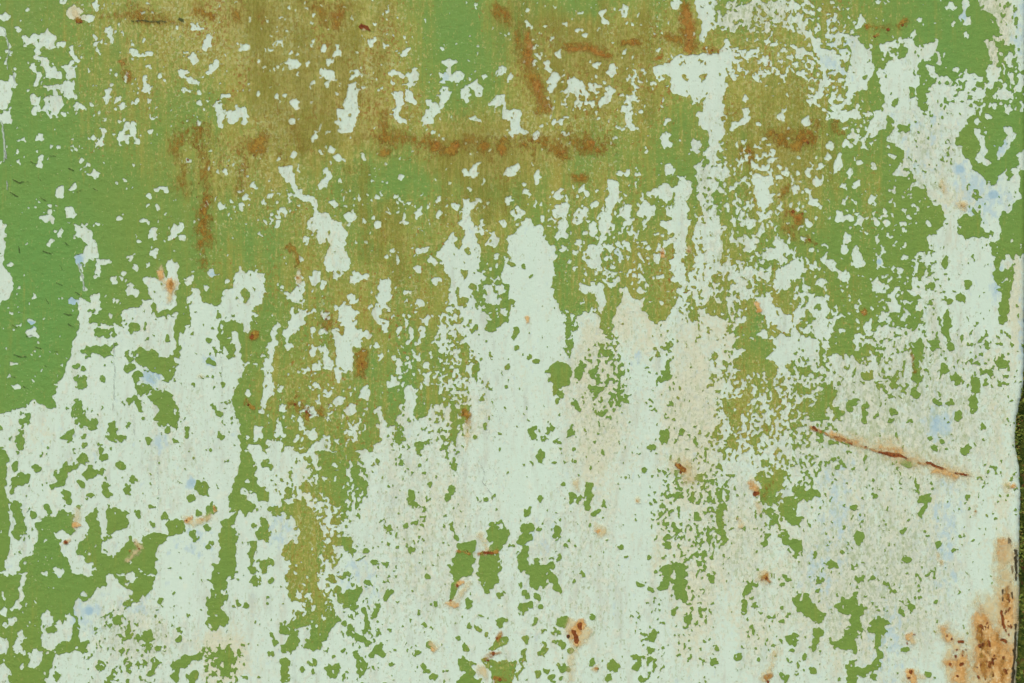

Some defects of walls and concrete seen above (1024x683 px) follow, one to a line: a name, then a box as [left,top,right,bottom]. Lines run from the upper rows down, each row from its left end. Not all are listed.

peeling [0,12,87,124]
peeling [258,151,384,418]
corrosion [376,111,507,156]
peeling [388,58,540,140]
corrosion [491,4,551,116]
corrosion [522,132,615,160]
peeling [572,179,640,314]
peeling [728,148,778,253]
peeling [694,0,875,123]
corrosion [810,426,970,478]
corrosion [566,619,591,678]
corrosion [941,537,1019,683]